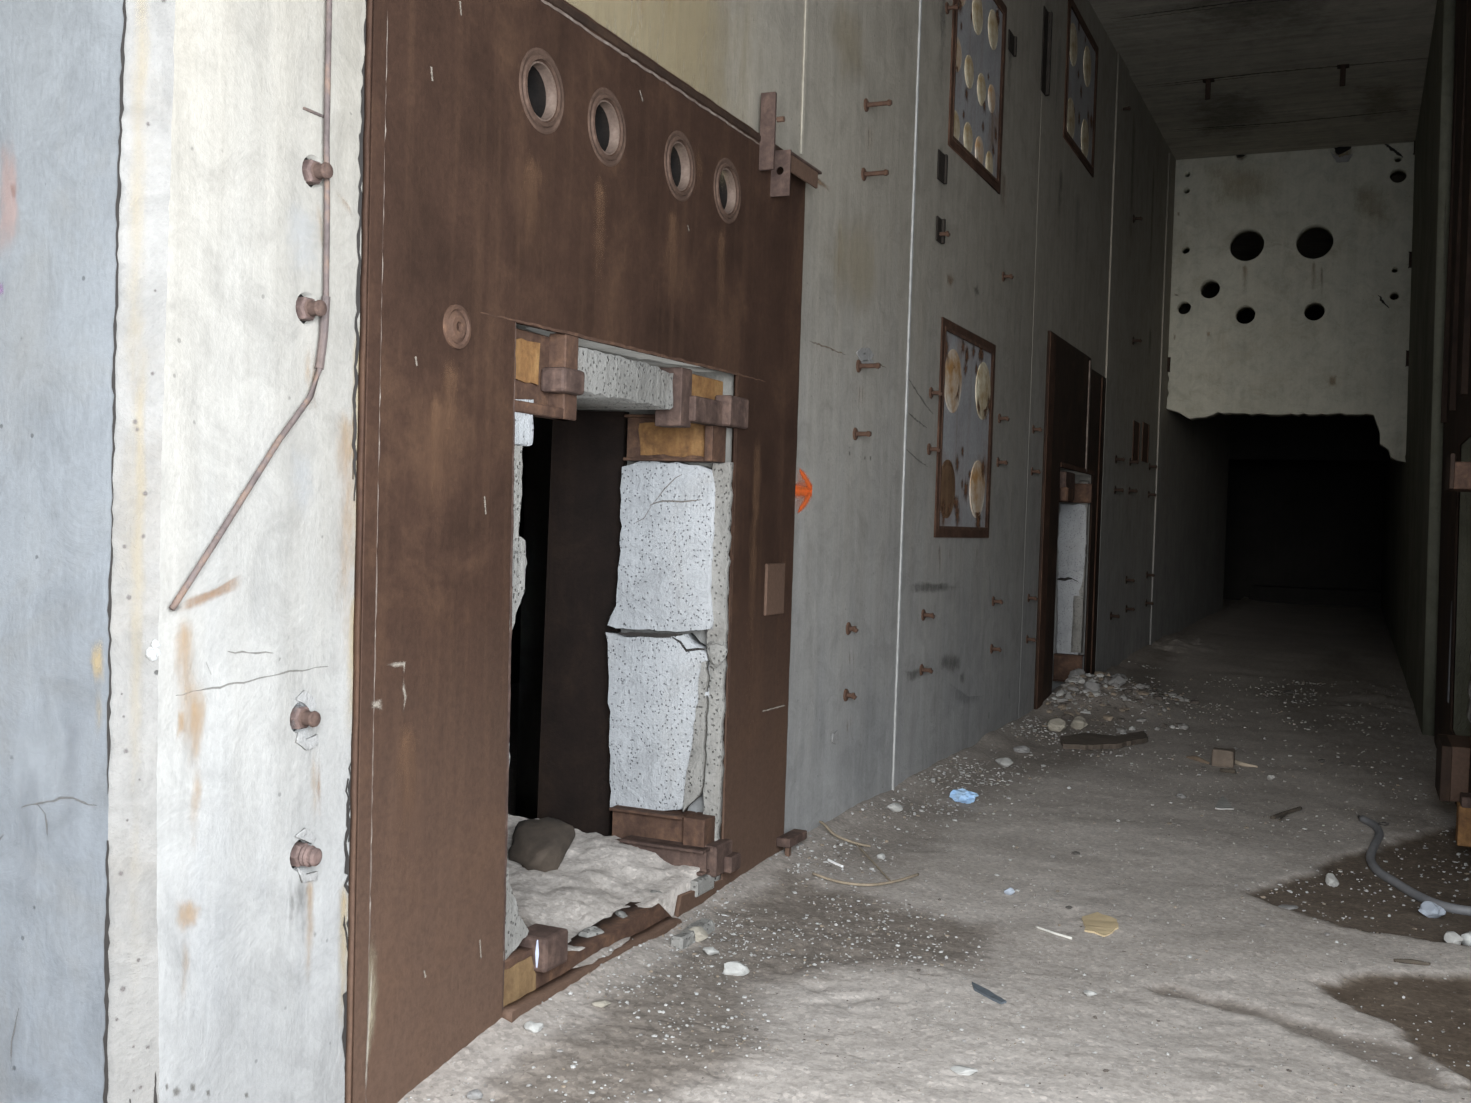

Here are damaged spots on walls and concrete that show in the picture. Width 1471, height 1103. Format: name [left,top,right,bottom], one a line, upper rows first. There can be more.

rust [565,0,713,94]
crack [176,651,328,696]